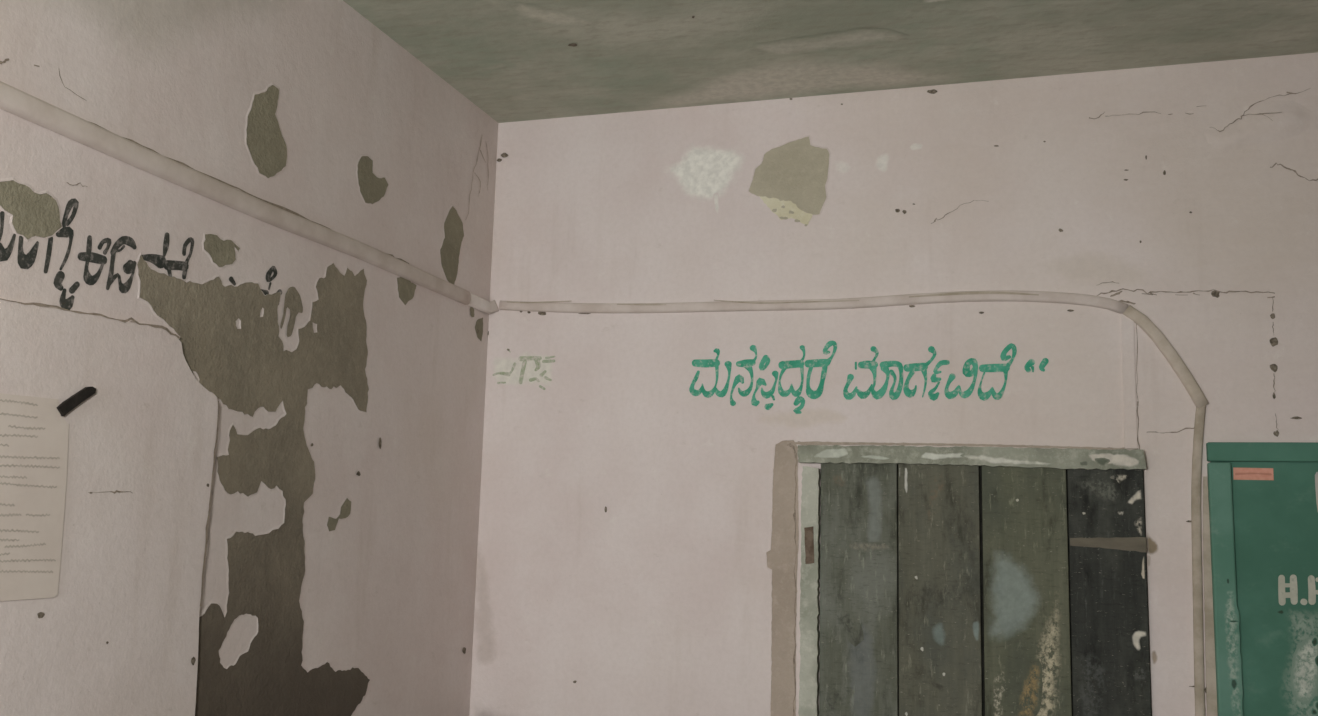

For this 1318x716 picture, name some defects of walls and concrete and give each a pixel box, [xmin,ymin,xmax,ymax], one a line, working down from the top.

peeling [244,83,288,181]
crack [1089,88,1310,132]
peeling [0,177,63,243]
peeling [356,154,389,206]
peeling [439,204,464,285]
damp [655,139,750,214]
spalling [747,135,831,226]
crack [1270,163,1318,181]
peeling [396,276,417,307]
flaking render [136,231,371,716]